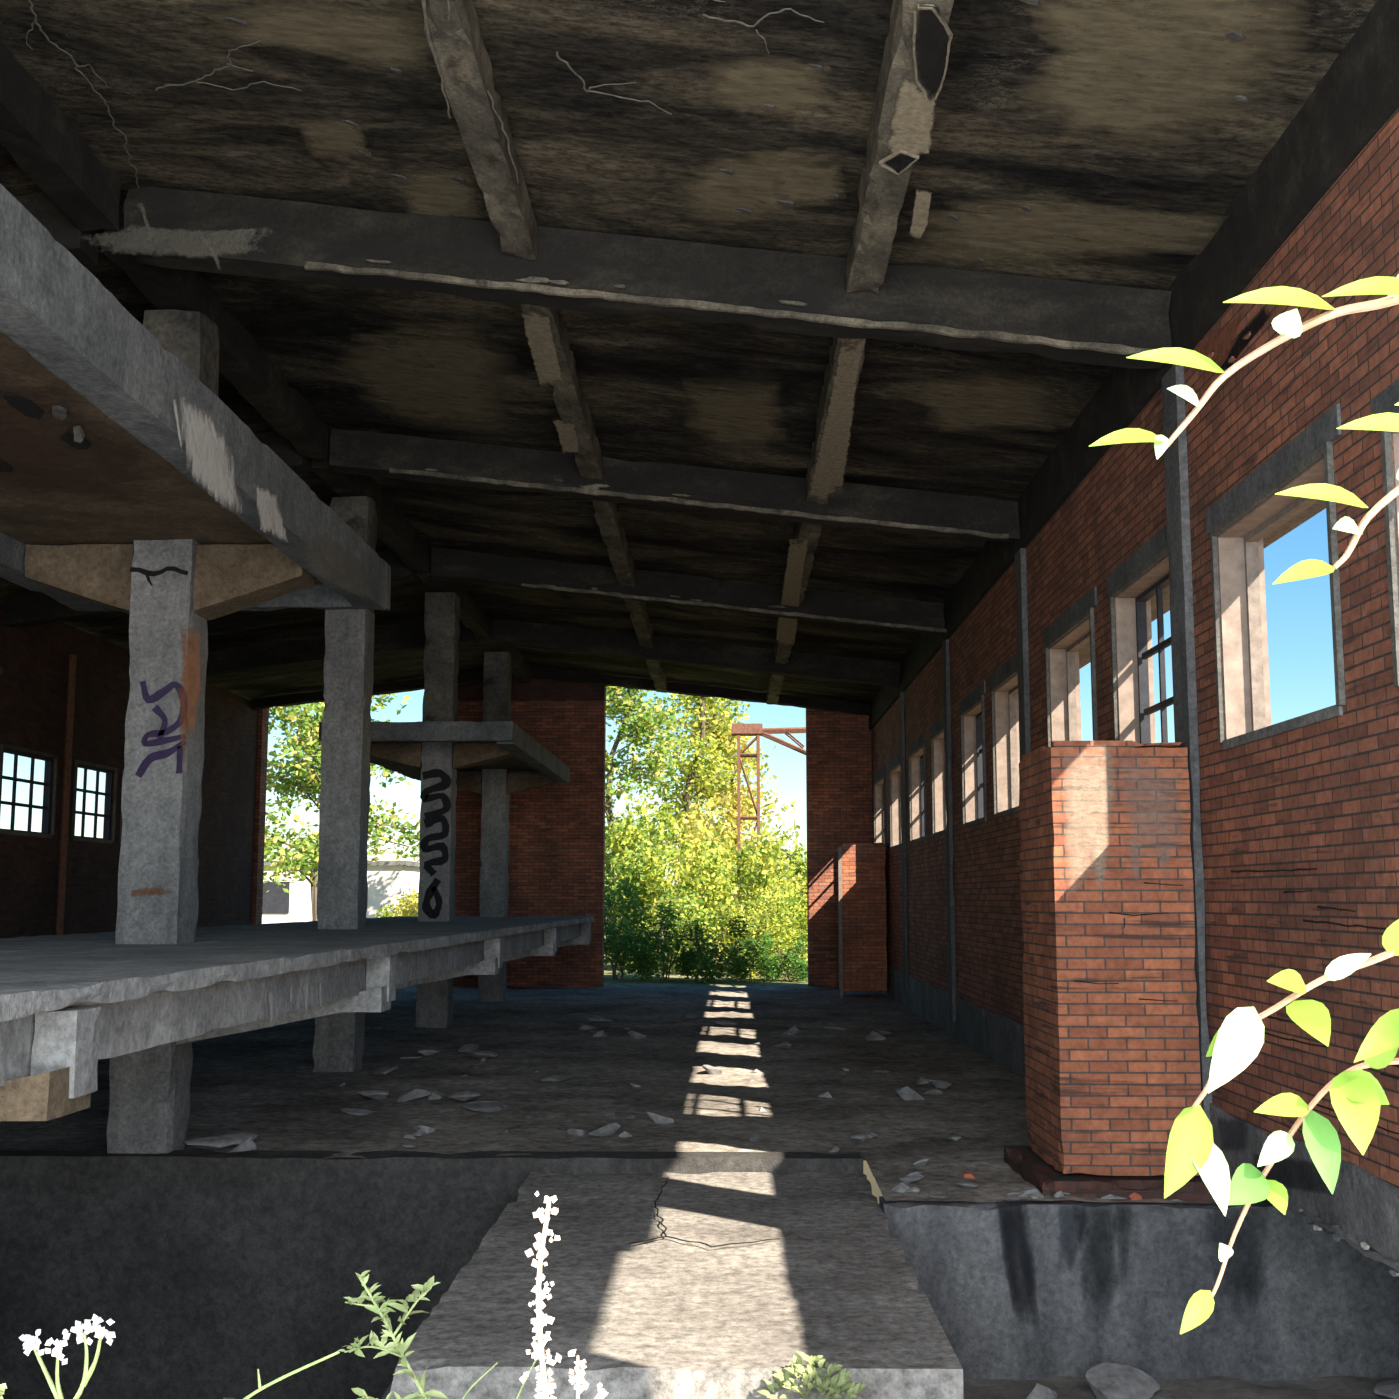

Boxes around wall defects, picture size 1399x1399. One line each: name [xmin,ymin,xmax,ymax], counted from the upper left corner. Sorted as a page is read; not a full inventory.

crack [703,0,824,53]
crack [556,52,672,115]
peeling [711,60,835,111]
spalling [879,4,953,175]
peeling [679,151,843,220]
crack [129,566,189,586]
water stain [1002,1205,1033,1310]
water stain [1060,1206,1127,1299]
water stain [1225,1221,1255,1295]